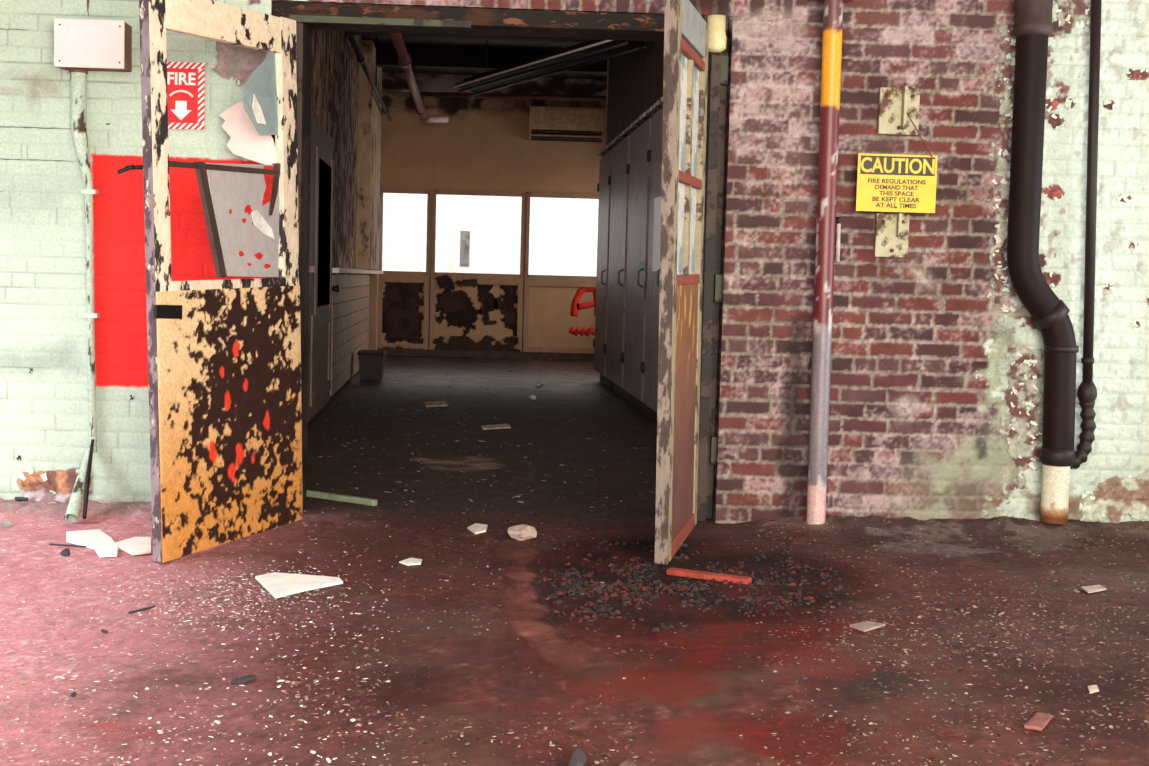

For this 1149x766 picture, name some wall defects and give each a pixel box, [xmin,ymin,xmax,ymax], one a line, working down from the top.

peeling [1054,0,1091,33]
peeling [1126,68,1149,80]
peeling [1045,97,1075,129]
peeling [1103,99,1117,110]
peeling [1044,184,1065,202]
peeling [1043,271,1061,288]
peeling [1004,344,1044,489]
spalling [16,455,93,503]
peeling [1079,478,1110,517]